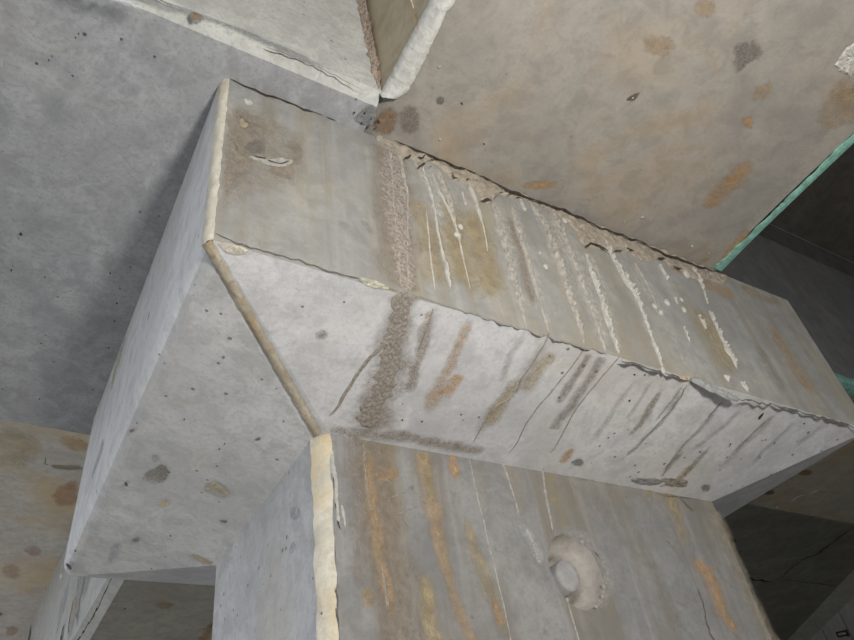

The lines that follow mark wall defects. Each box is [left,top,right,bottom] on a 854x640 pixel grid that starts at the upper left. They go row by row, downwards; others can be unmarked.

crack [152,0,363,91]
spalling [834,44,854,97]
damp [377,148,433,388]
damp [336,406,481,452]
damp [553,359,601,429]
crack [60,579,112,640]